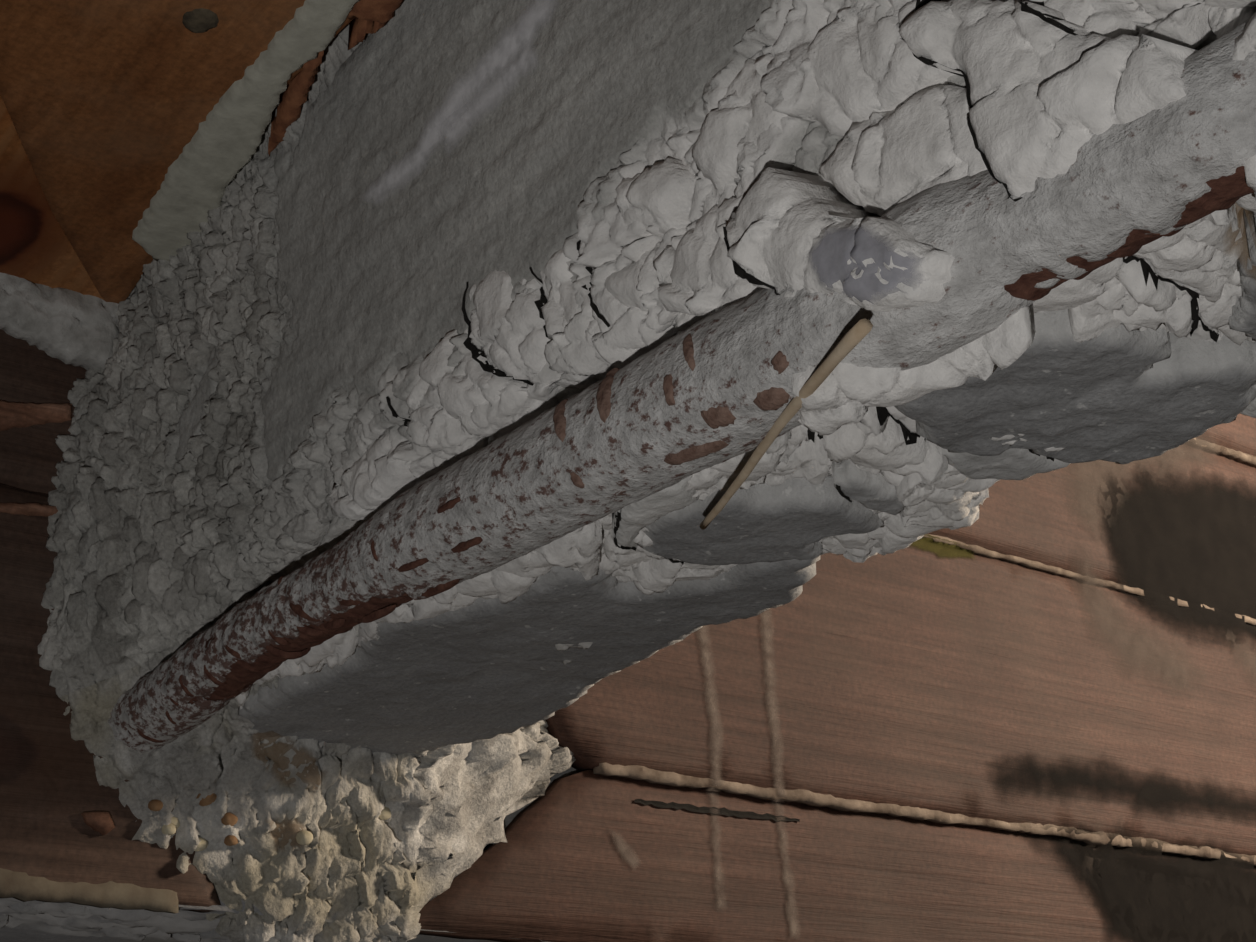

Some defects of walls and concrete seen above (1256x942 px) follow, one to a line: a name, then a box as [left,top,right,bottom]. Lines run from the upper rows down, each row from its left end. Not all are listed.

crack [915,0,941,11]
crack [900,38,1022,202]
crack [462,282,534,386]
crack [529,267,548,338]
crack [577,240,610,327]
crack [723,227,780,295]
crack [1123,255,1219,343]
crack [807,429,823,442]
crack [876,407,926,445]
damp [1076,437,1256,642]
damp [998,757,1256,816]
damp [1034,830,1256,942]